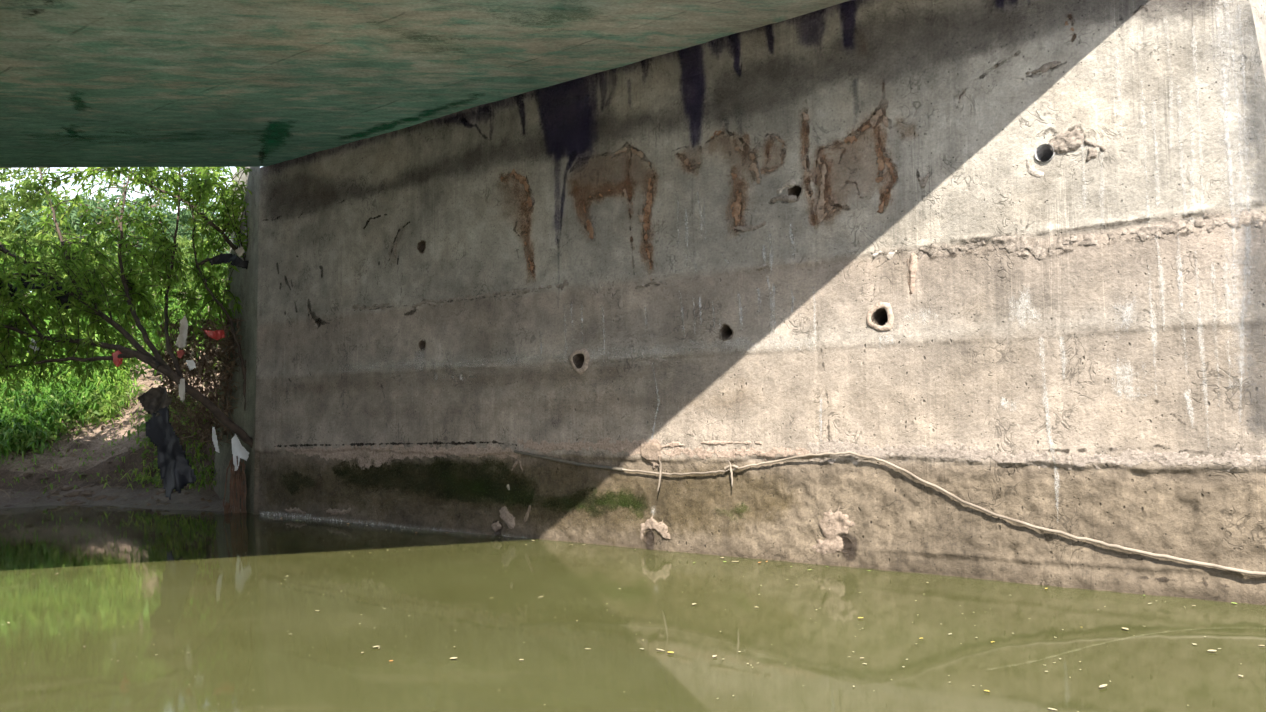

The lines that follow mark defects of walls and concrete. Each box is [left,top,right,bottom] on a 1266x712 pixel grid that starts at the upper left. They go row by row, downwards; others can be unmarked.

water stain [341,94,487,139]
water stain [514,77,592,231]
water stain [678,45,706,147]
water stain [730,32,742,77]
water stain [765,24,774,53]
spalling [676,82,898,234]
water stain [840,0,857,49]
spalling [276,169,569,328]
spalling [569,142,666,288]